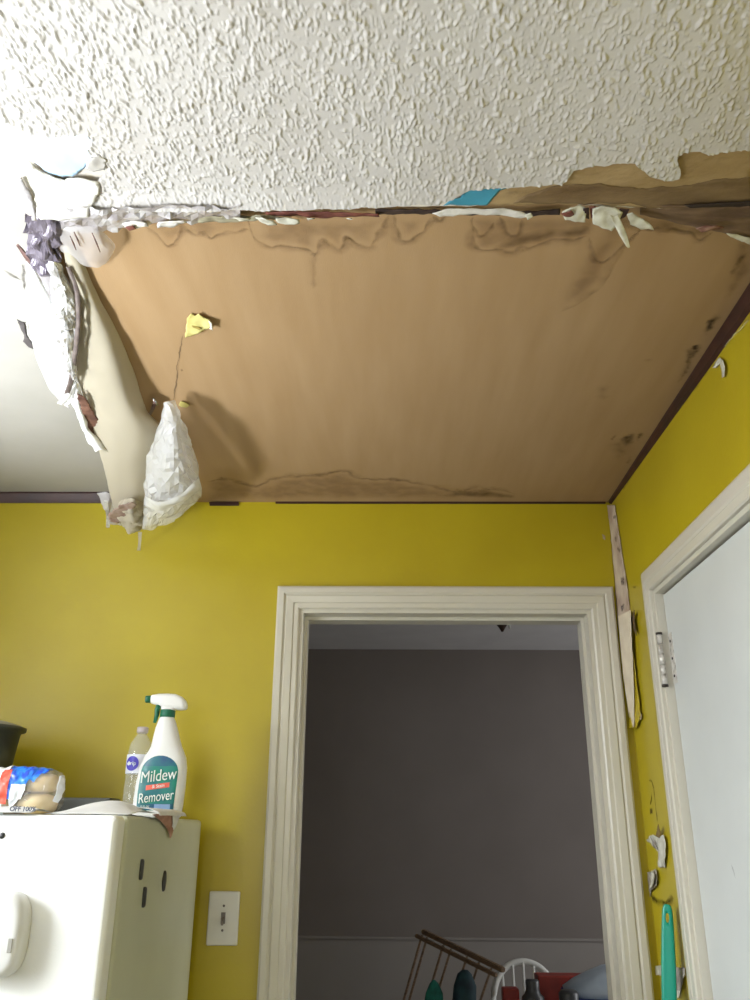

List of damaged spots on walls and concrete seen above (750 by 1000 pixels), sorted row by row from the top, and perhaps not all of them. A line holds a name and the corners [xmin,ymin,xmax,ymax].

peeling [443,150,750,220]
peeling [123,220,187,229]
spalling [712,357,725,378]
peeling [646,824,668,896]